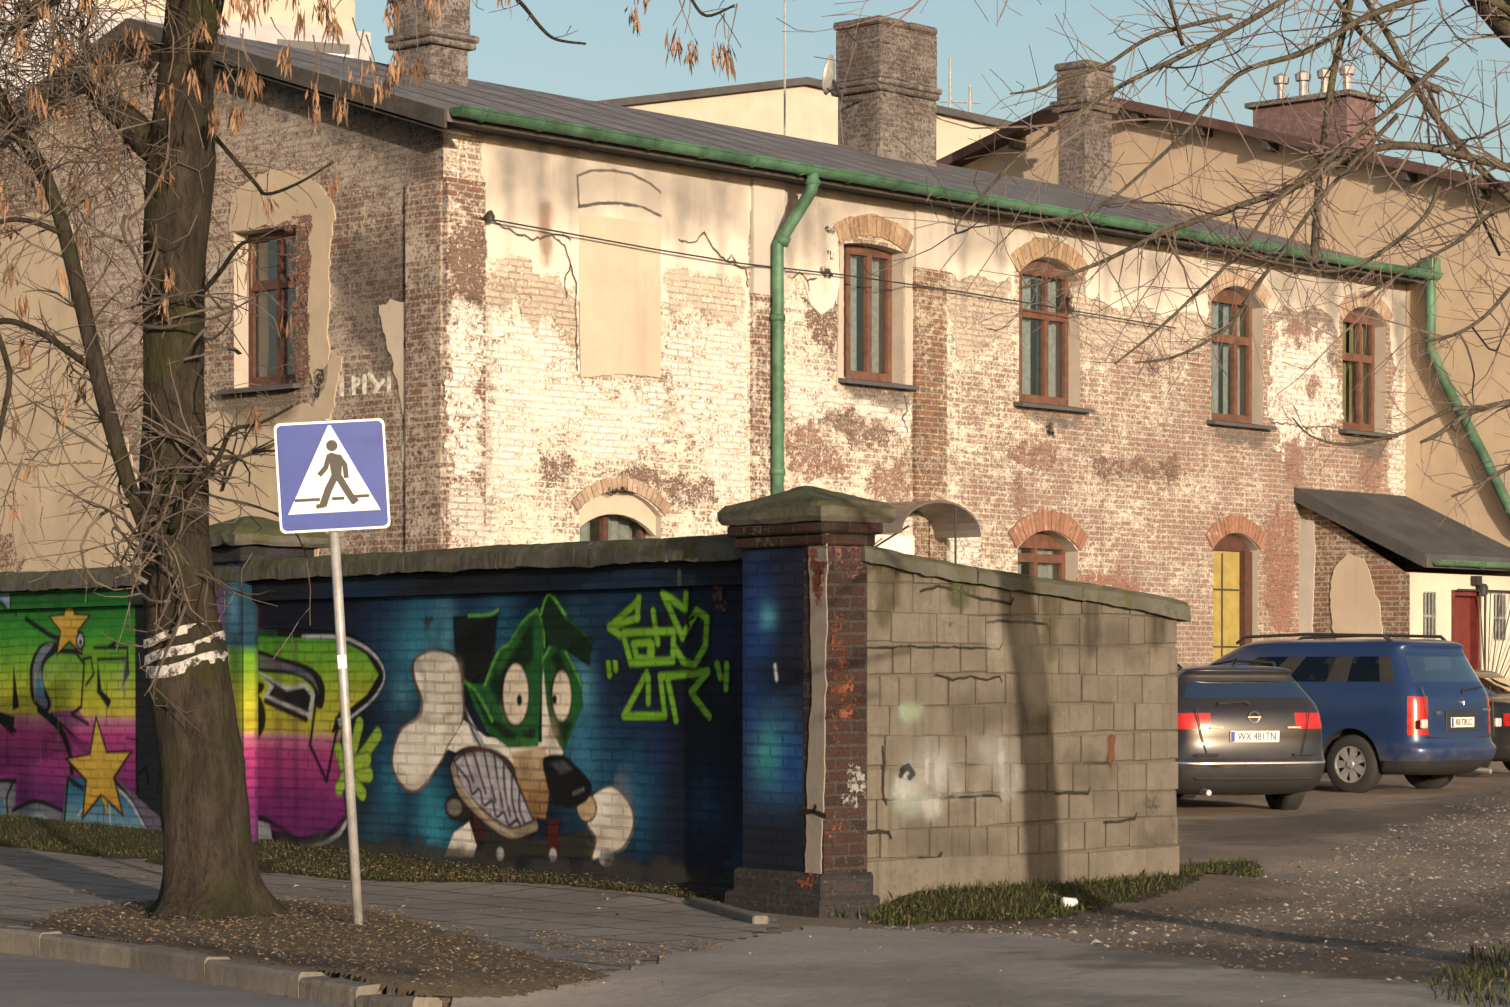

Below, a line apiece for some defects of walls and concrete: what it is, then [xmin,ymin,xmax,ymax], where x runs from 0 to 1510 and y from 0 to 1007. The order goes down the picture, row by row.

flaking render [206,169,342,525]
flaking render [379,299,406,463]
flaking render [442,135,751,378]
spalling [531,449,720,515]
spalling [785,402,910,503]
spalling [1007,438,1063,517]
spalling [1091,451,1186,488]
flaking render [947,209,1406,408]